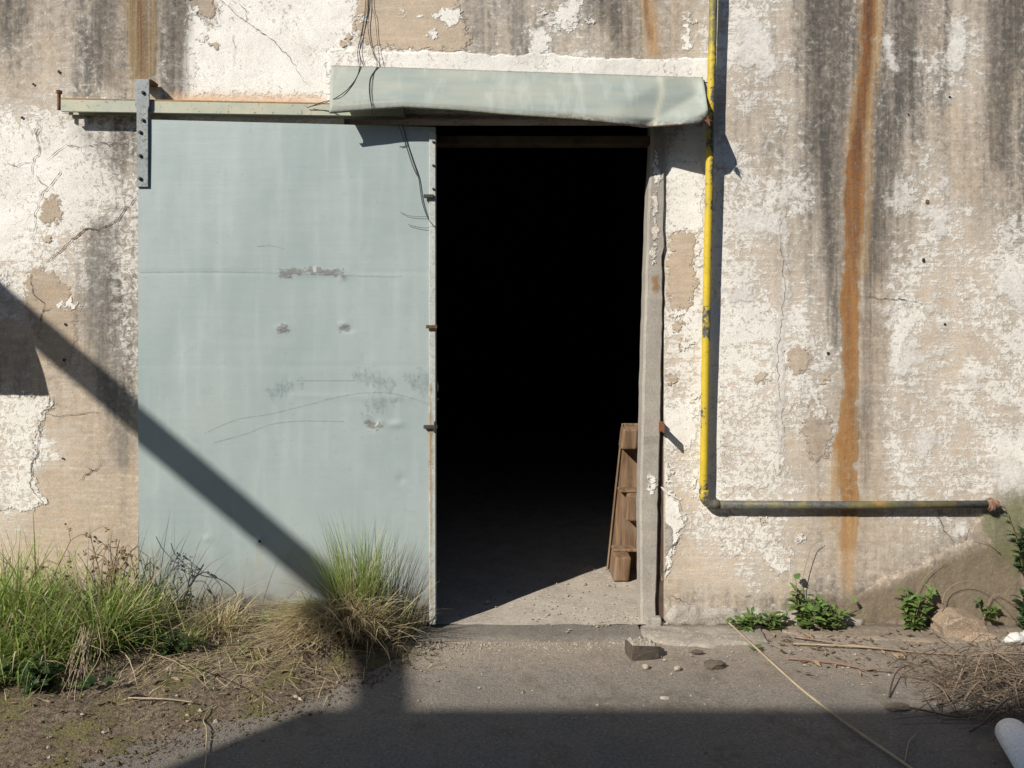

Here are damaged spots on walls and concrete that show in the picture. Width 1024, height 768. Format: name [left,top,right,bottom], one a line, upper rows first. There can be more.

crack [222,1,306,83]
peeling [526,0,596,54]
peeling [38,193,65,243]
crack [8,121,128,239]
crack [30,198,136,336]
peeling [649,150,705,352]
corrosion [832,0,882,579]
peeling [718,146,835,576]
peeling [0,390,56,514]
peeling [647,391,701,582]